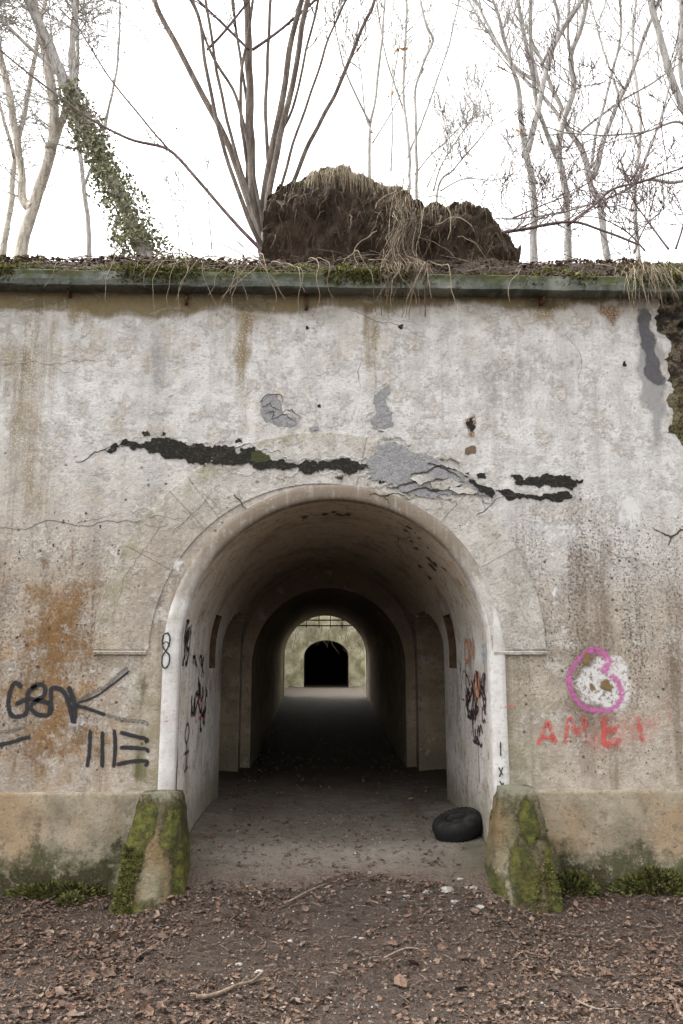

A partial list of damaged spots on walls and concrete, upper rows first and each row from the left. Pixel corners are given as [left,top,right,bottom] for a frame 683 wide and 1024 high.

leakage [0,292,619,363]
crack [0,490,246,626]
spalling [76,382,683,663]
crack [583,527,683,576]
corrosion [22,581,94,775]